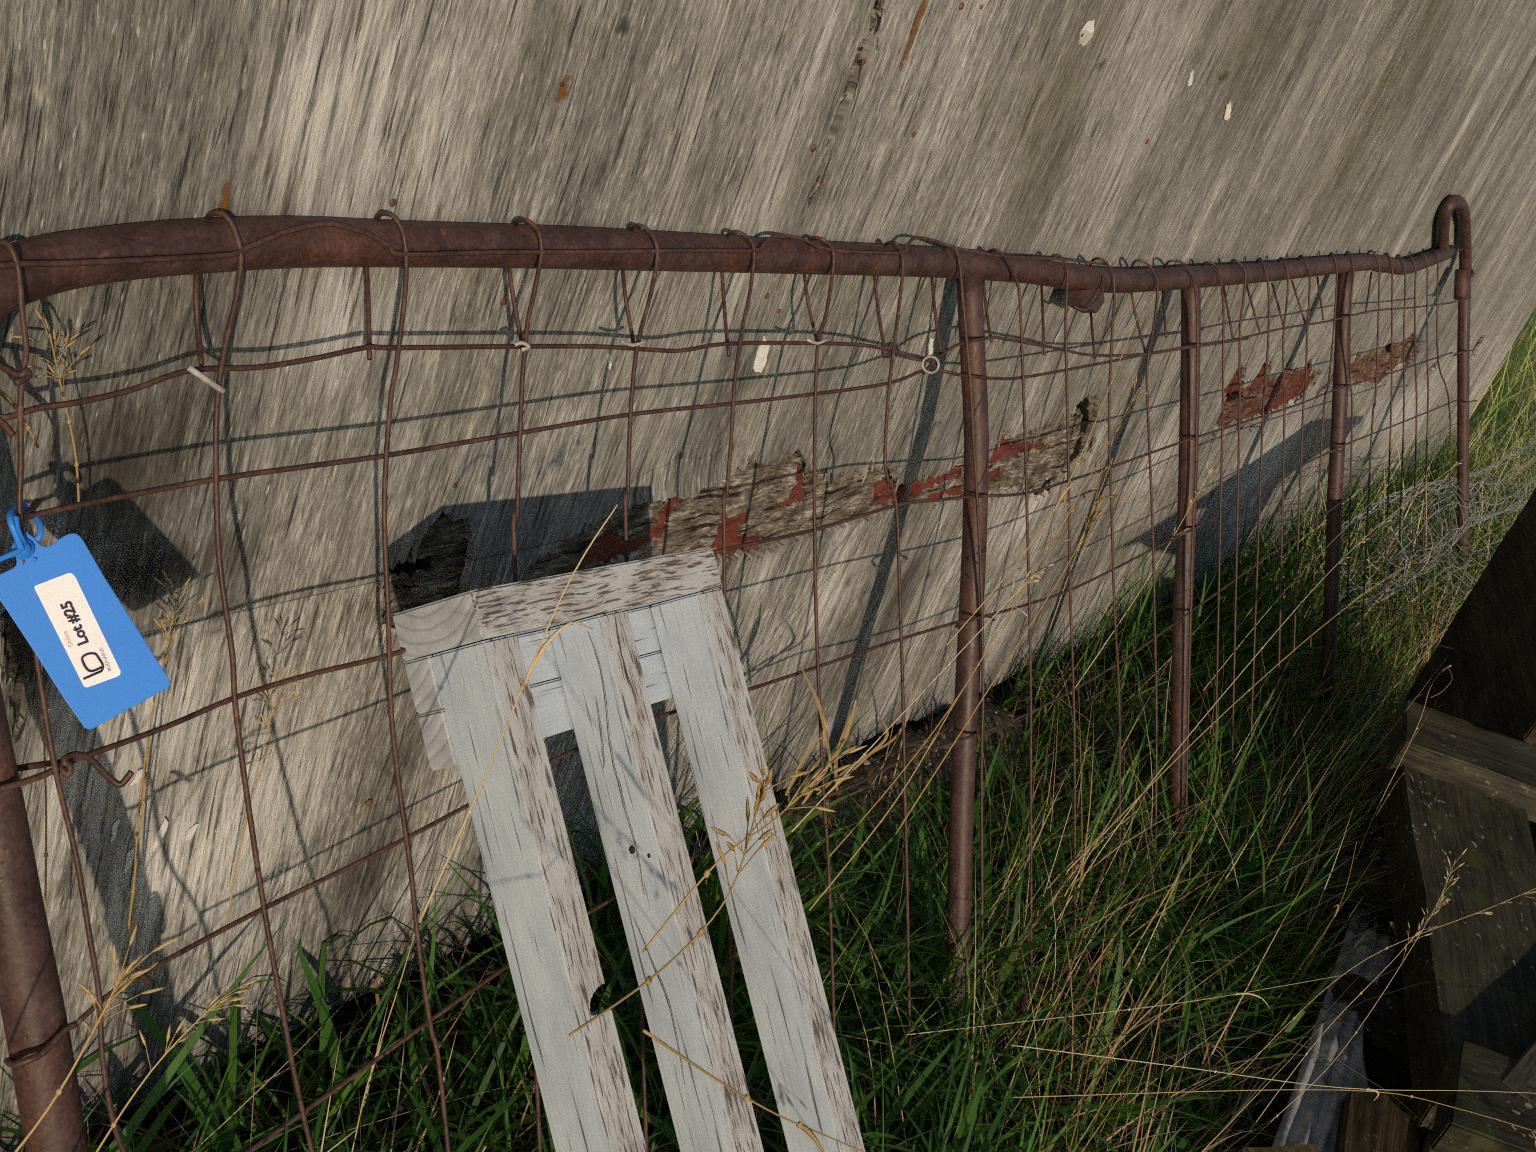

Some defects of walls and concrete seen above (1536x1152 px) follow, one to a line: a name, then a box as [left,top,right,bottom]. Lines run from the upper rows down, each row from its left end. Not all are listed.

crack [807,0,885,207]
rust [901,0,927,70]